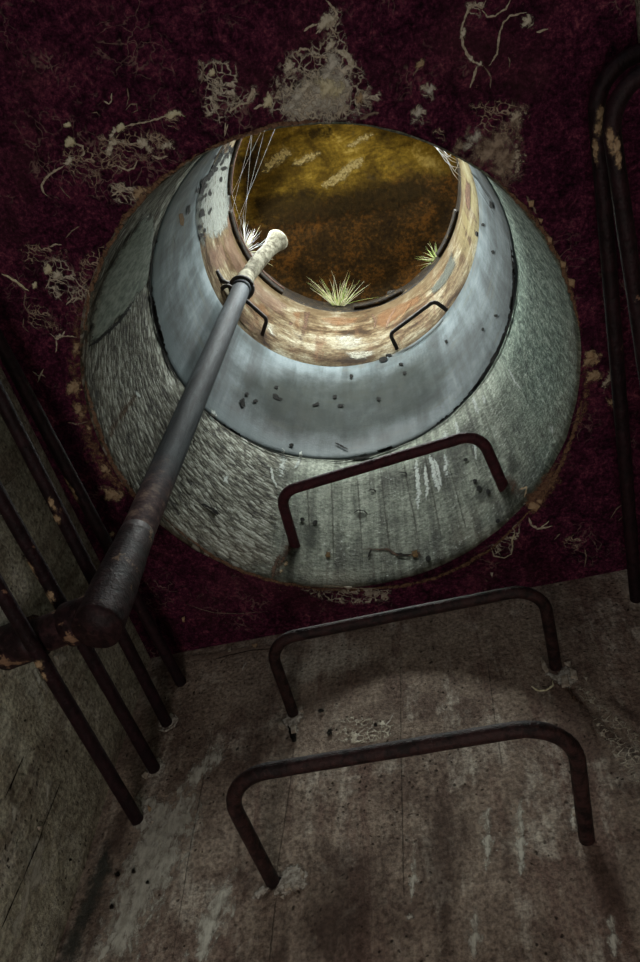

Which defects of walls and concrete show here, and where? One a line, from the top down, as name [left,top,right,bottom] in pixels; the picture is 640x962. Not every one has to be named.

peeling [179,145,234,245]
corrosion [67,119,427,502]
corrosion [431,252,455,292]
damp [414,454,449,509]
corrosion [162,510,531,592]